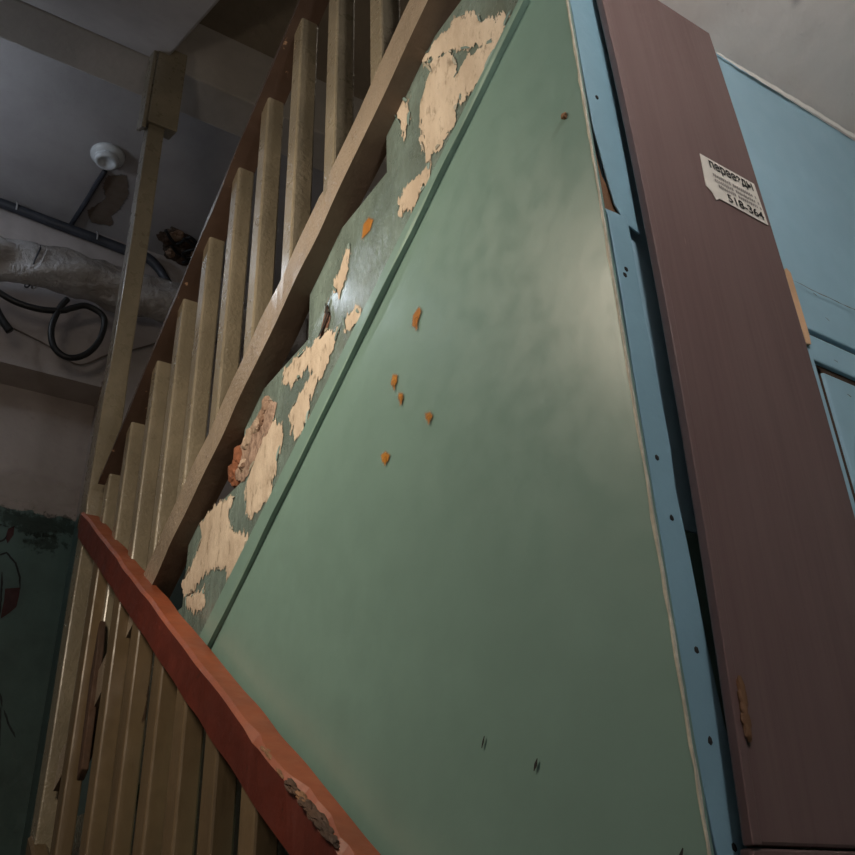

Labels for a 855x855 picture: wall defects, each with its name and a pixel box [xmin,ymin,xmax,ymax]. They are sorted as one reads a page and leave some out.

peeling [395,10,511,217]
peeling [181,243,361,616]
rust [391,375,403,405]
rust [412,307,421,330]